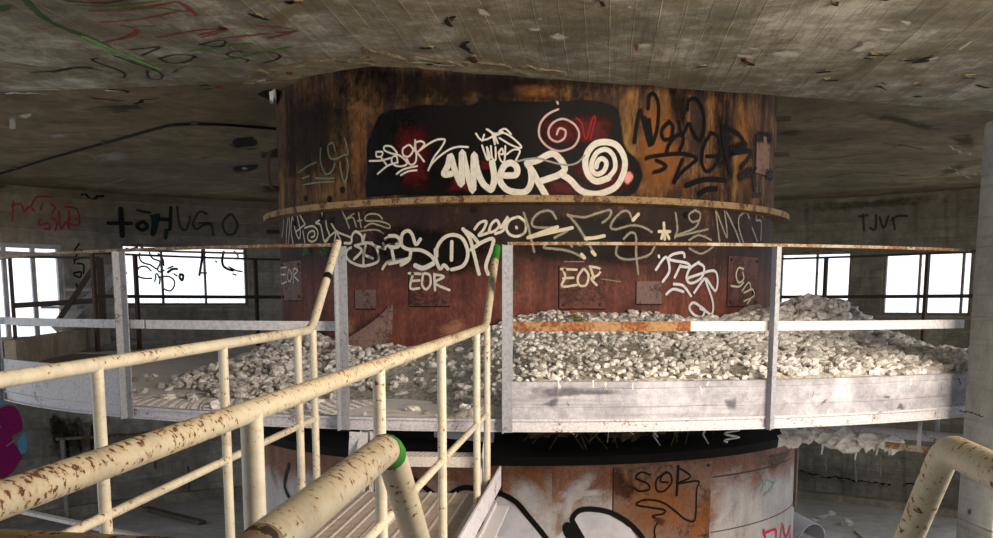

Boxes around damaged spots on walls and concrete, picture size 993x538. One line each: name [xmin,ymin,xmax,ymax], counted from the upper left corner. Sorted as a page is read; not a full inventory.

spalling [853,20,941,63]
corrosion [657,121,676,175]
corrosion [442,321,464,335]
crack [799,470,914,486]
corrosion [638,483,685,522]